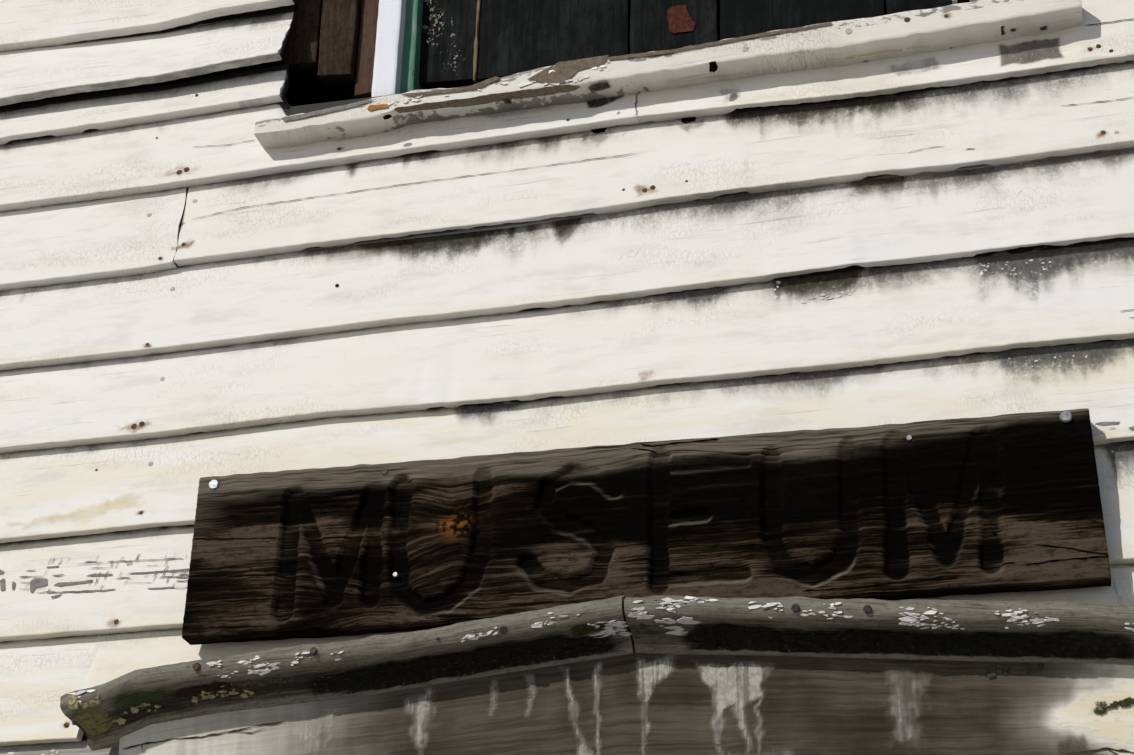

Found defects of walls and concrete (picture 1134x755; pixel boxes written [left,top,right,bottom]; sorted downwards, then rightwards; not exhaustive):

peeling [387,0,832,113]
peeling [282,99,372,121]
leakage [725,92,924,124]
leakage [1038,147,1134,161]
leakage [851,176,905,189]
leakage [298,227,515,253]
leakage [552,217,583,238]
leakage [773,262,938,294]
leakage [978,240,1134,288]
leakage [996,340,1134,369]
leakage [311,622,615,744]
leakage [638,660,672,702]